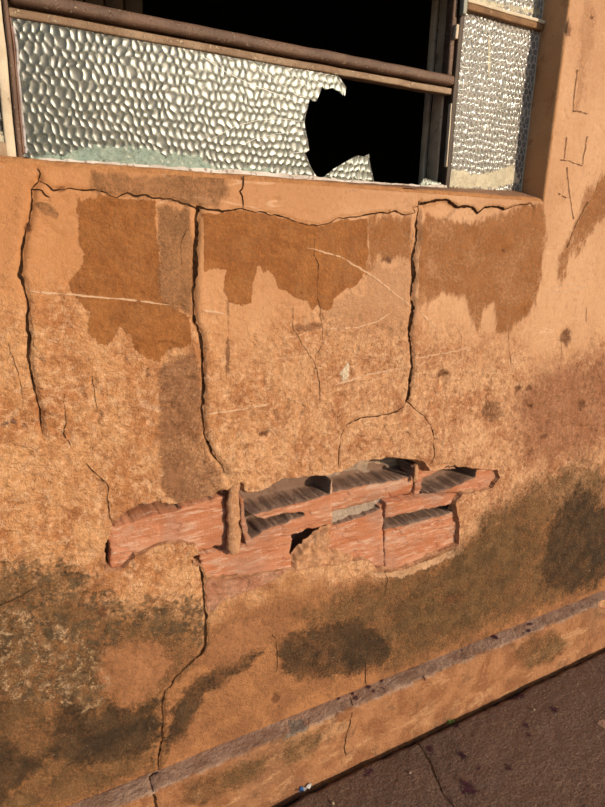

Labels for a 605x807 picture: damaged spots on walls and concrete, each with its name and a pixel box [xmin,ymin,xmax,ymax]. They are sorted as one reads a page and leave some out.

leakage [558,177,605,279]
crack [8,156,534,471]
crack [86,463,112,520]
spalling [103,457,500,612]
leakage [278,359,605,693]
leakage [0,559,264,807]
crack [149,566,208,807]
leakage [283,734,321,765]
crack [344,631,366,756]